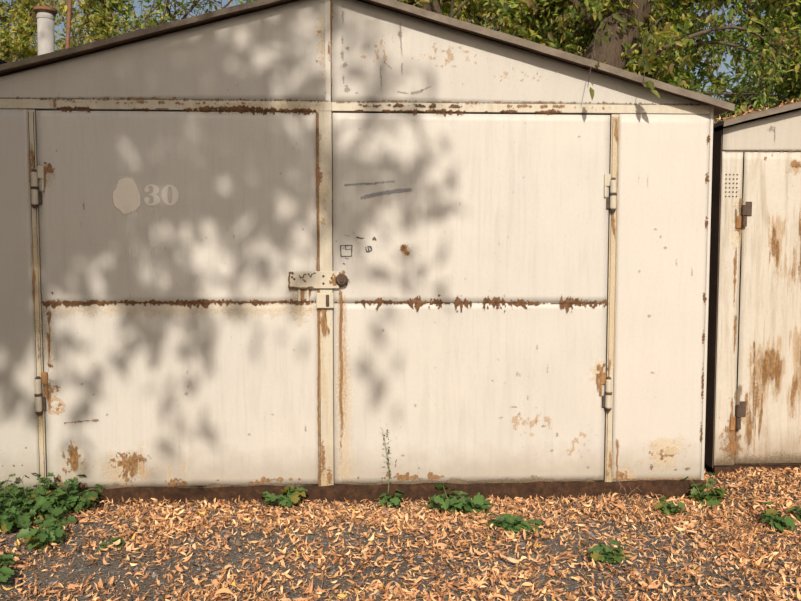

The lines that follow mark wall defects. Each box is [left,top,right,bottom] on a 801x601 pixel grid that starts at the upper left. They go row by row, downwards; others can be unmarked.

rust [53,100,91,112]
rust [382,108,466,117]
rust [725,150,801,168]
rust [770,226,779,270]
rust [355,295,608,313]
rust [32,270,350,490]
rust [719,341,782,460]
rust [341,472,594,485]